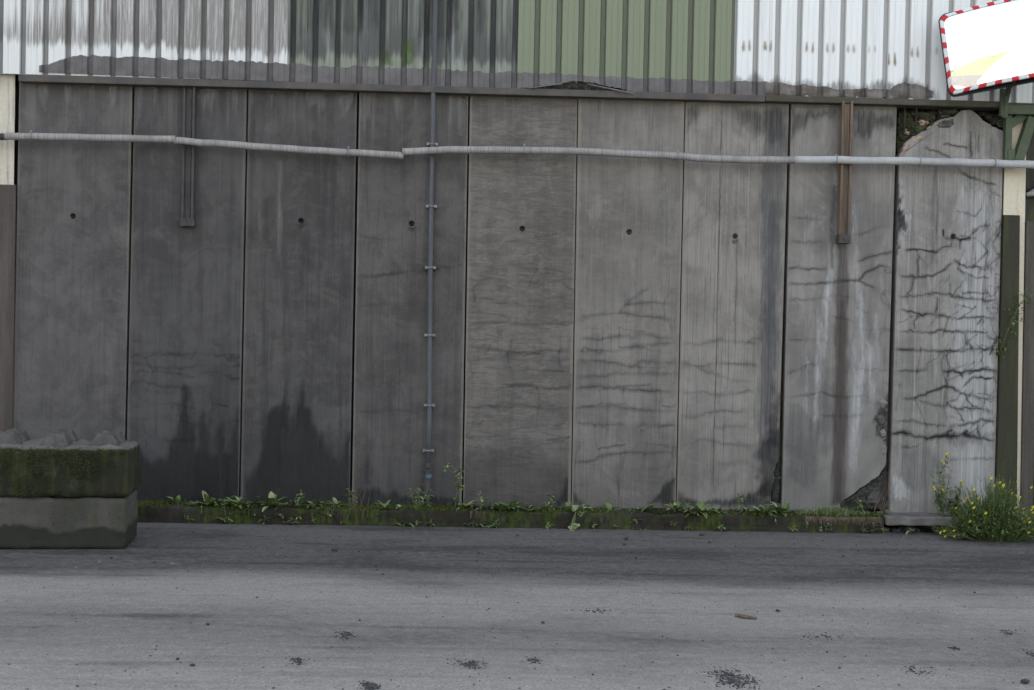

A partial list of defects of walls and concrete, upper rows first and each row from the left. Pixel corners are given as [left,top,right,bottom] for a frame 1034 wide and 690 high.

spalling [896,107,958,155]
leakage [136,390,457,505]
leakage [712,111,782,506]
efflorescence [806,244,832,421]
crack [793,254,881,287]
spalling [840,396,889,511]
efflorescence [852,265,879,467]
crack [892,225,995,440]